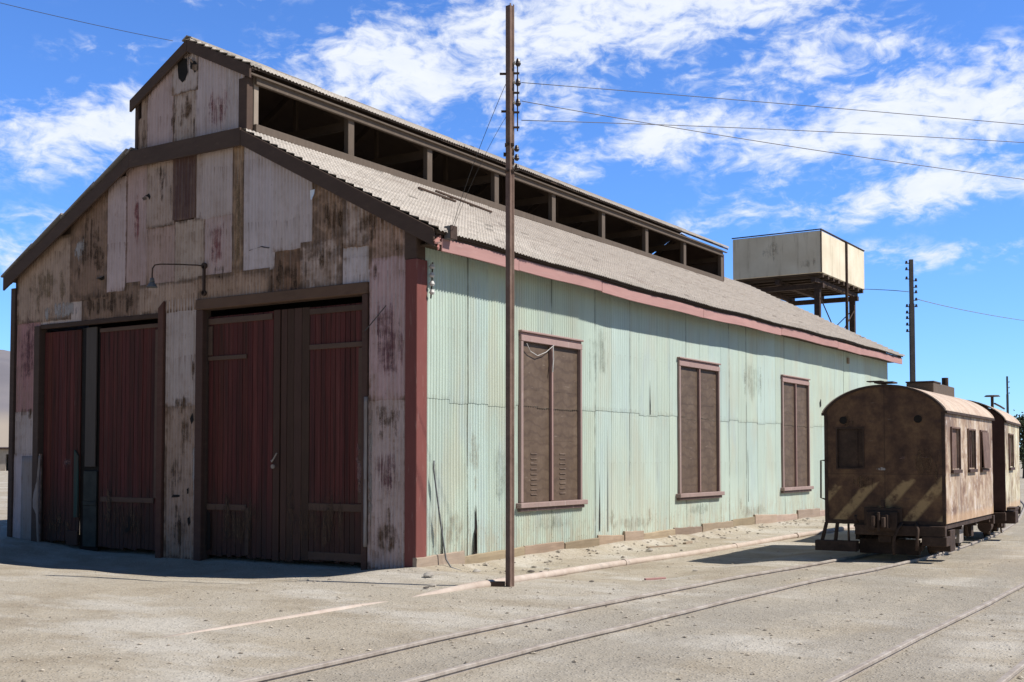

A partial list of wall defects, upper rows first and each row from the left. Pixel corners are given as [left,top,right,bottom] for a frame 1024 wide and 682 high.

corrosion [378,508,396,552]
crack [471,510,479,554]